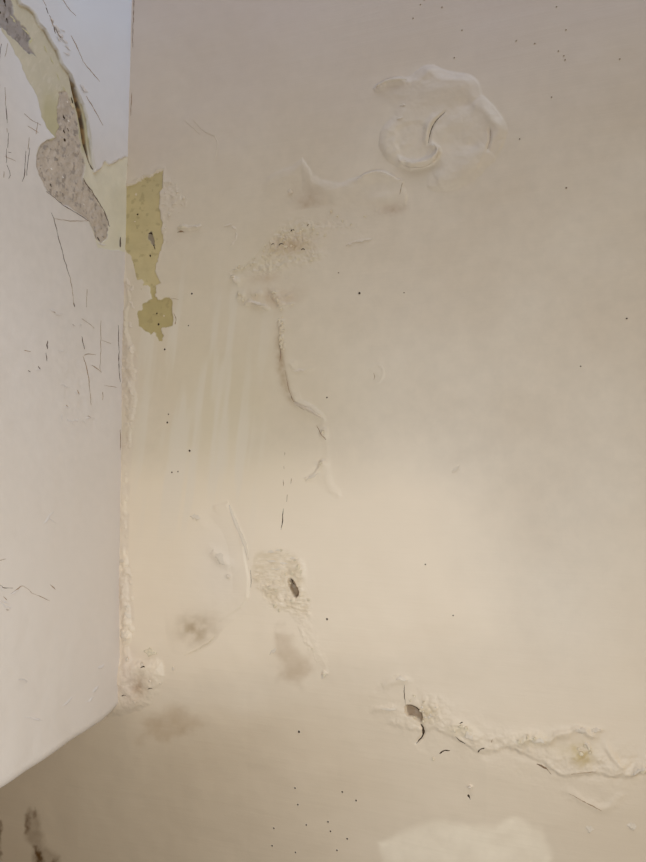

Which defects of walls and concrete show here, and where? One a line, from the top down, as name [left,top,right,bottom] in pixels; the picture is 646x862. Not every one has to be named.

peeling [0,0,189,345]
spalling [250,542,336,681]